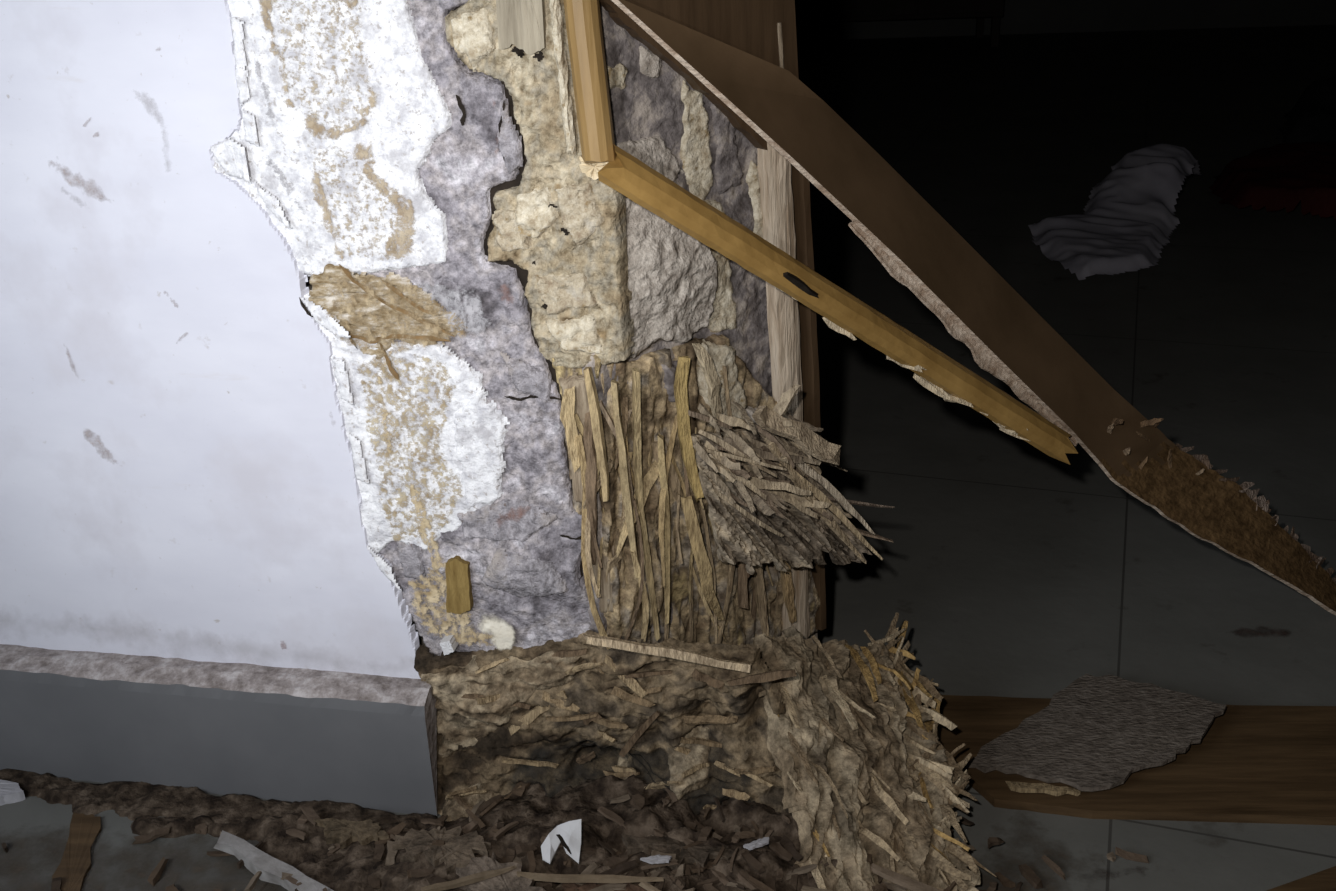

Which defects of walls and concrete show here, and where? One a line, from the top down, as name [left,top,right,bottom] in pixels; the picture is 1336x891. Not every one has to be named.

spalling [210,0,796,656]